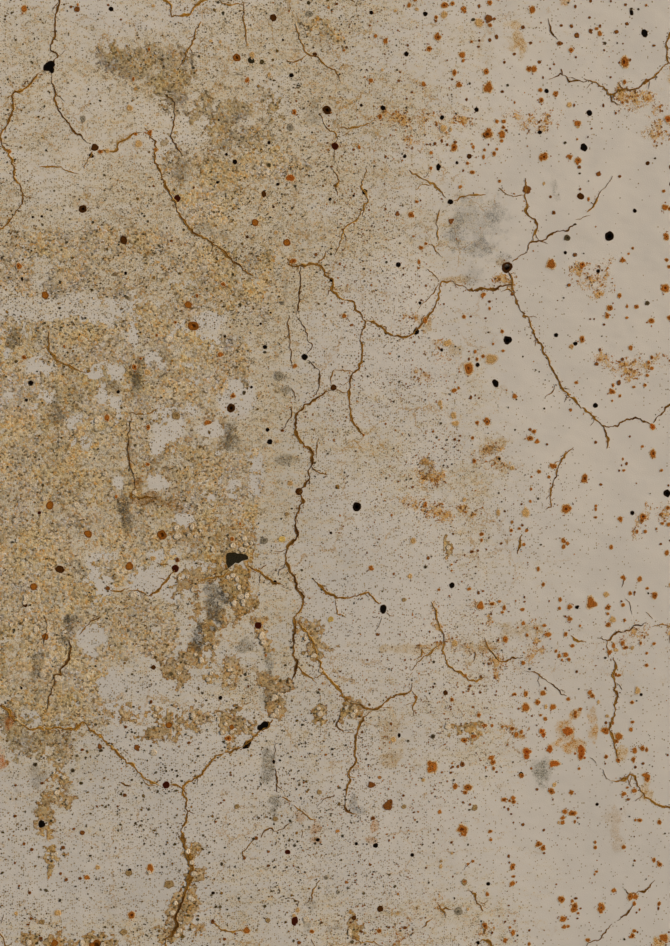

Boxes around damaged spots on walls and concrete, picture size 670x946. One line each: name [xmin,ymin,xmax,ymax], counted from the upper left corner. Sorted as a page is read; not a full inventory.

crack [550,32,670,106]
crack [0,0,253,279]
crack [242,169,670,861]
crack [110,563,175,597]
crack [47,612,101,708]
corrosion [606,638,656,667]
crack [0,704,277,946]
corrosion [500,795,525,826]
corrosion [557,807,580,825]
corrosion [604,744,652,823]
crack [422,861,497,946]
crack [587,880,655,945]